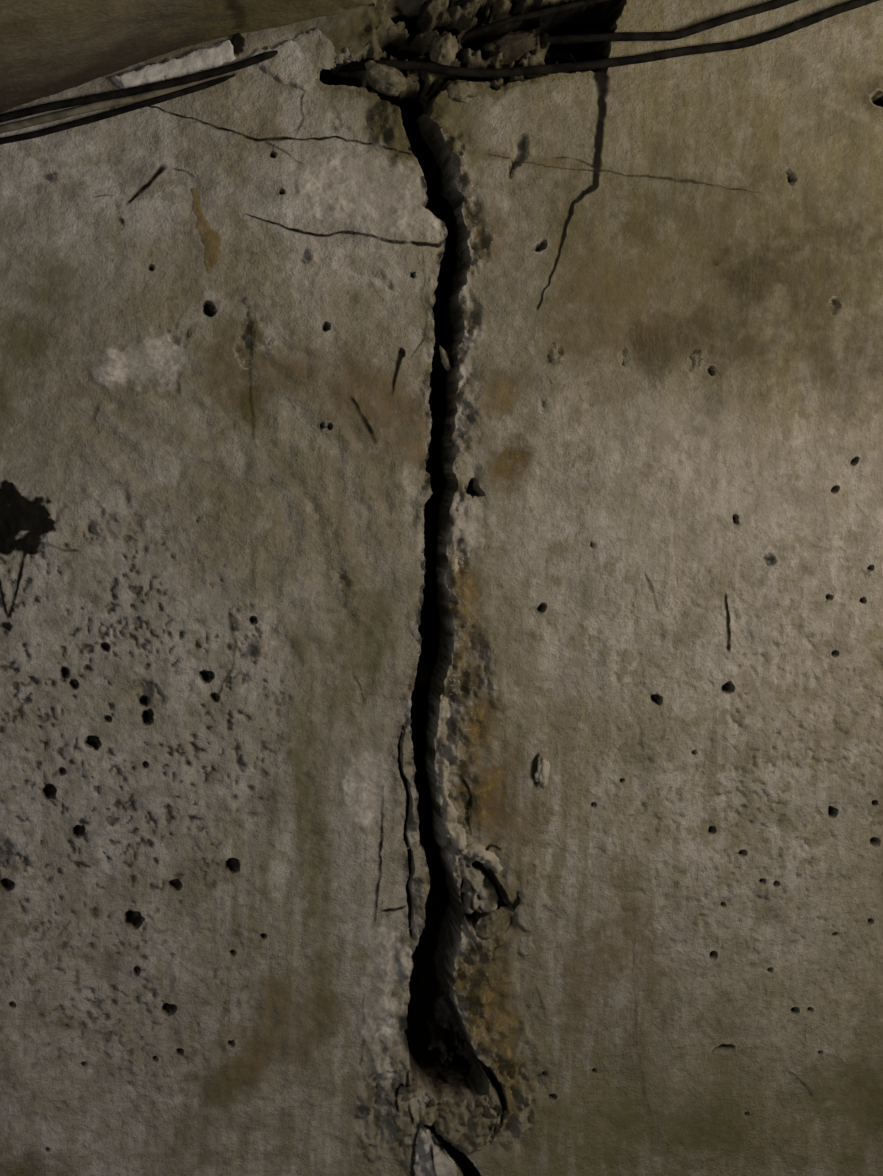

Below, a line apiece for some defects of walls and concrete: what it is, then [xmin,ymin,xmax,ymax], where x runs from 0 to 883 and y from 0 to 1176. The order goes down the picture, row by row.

spalling [111,0,627,173]
peeling [298,154,375,221]
peeling [390,186,439,236]
crack [493,71,749,310]
crack [148,95,550,1176]
peeling [414,1128,459,1176]